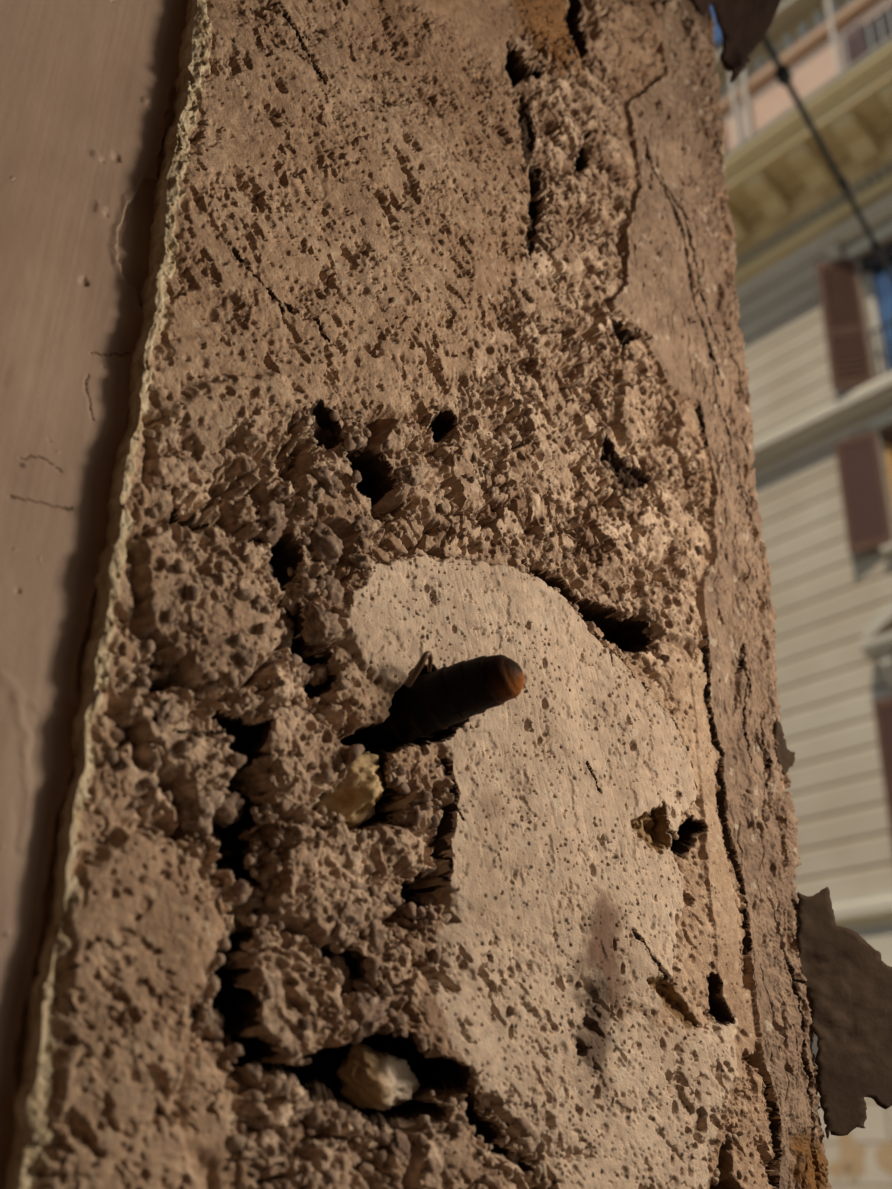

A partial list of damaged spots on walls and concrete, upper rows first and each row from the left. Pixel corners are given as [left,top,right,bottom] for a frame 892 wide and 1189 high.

flaking render [661,0,781,83]
spalling [96,0,710,1189]
crack [428,755,465,882]
crack [570,602,815,1161]
spalling [646,972,735,1030]
crack [763,1081,782,1189]